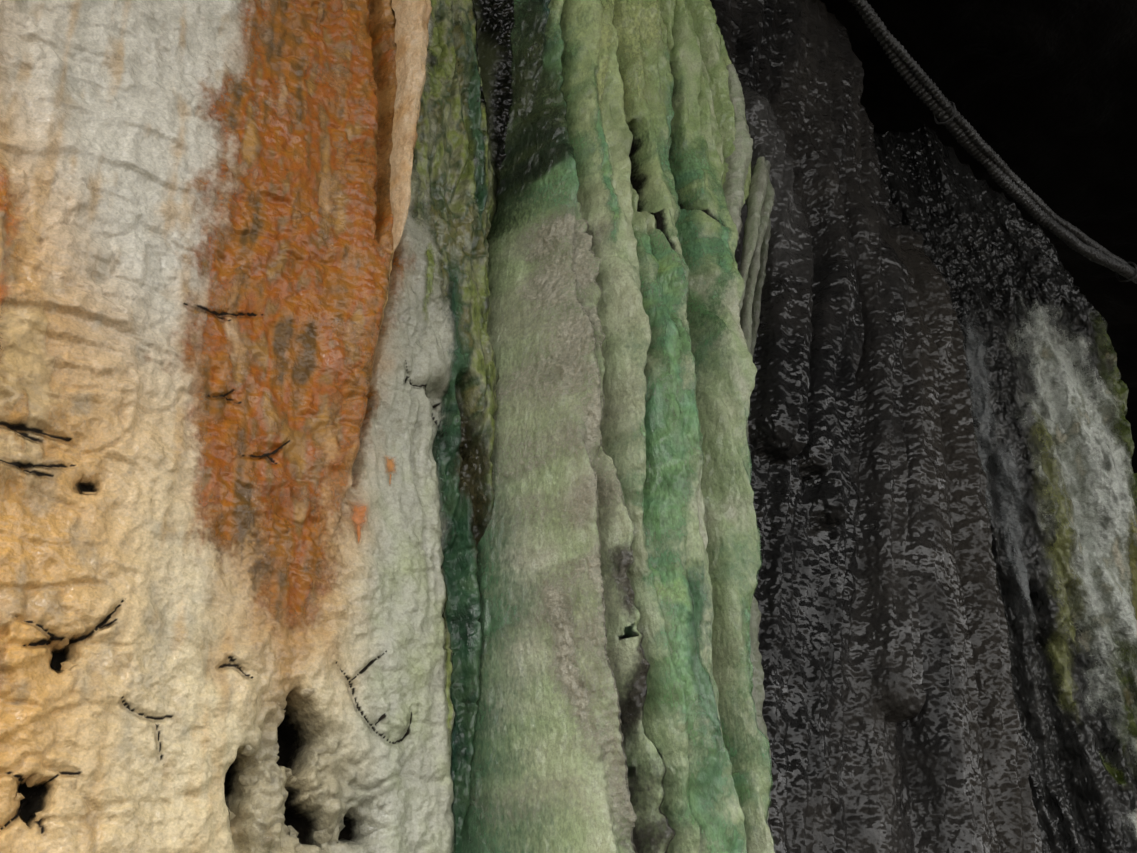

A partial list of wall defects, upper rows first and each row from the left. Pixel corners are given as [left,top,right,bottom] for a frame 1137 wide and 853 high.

corrosion [0,175,67,502]
corrosion [184,0,404,626]
leakage [423,0,622,559]
leakage [657,205,734,420]
spalling [15,774,54,826]
crack [23,600,124,647]
spalling [224,745,258,821]
spalling [276,707,378,845]
leakage [442,580,456,774]
leakage [536,544,675,853]
leakage [688,571,758,804]